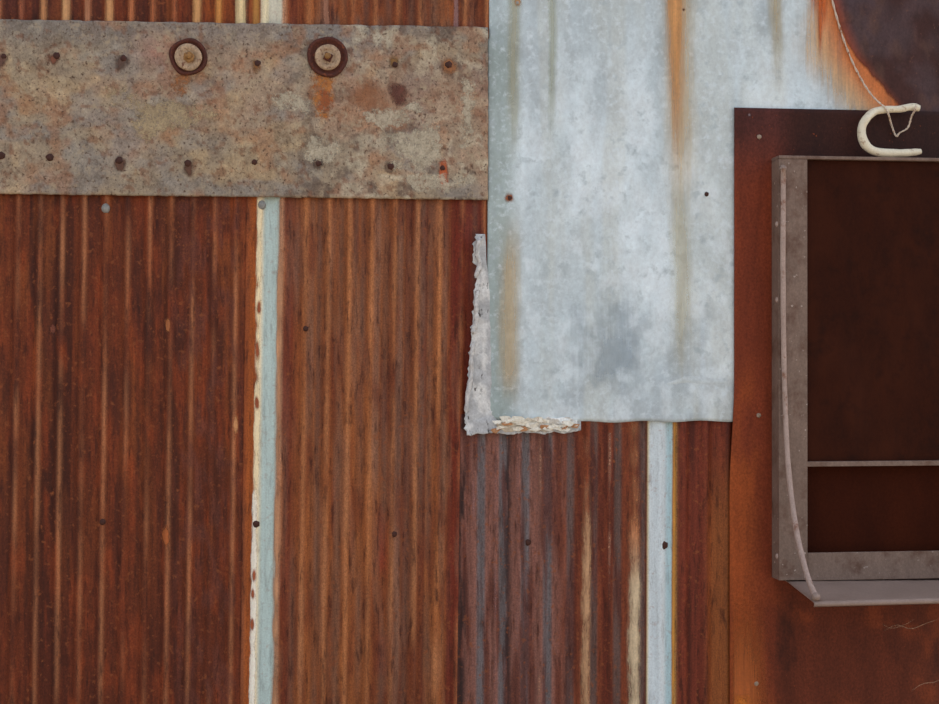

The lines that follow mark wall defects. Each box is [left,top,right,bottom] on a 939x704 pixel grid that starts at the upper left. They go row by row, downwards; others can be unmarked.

corrosion [312,73,335,118]
corrosion [389,84,405,106]
corrosion [668,0,683,123]
corrosion [810,0,939,112]
peeling [491,416,580,433]
corrosion [272,493,280,642]